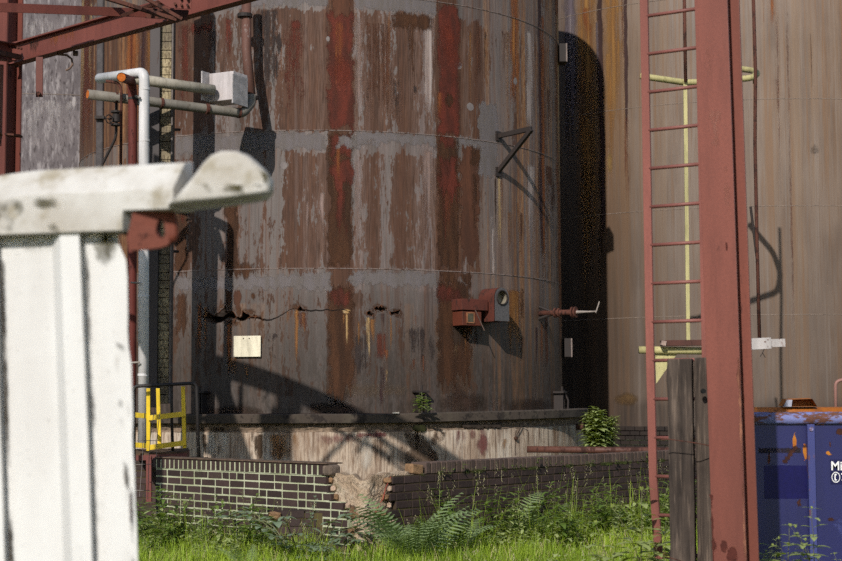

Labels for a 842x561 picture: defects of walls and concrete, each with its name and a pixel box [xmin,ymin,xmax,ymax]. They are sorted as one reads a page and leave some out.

peeling [303,0,486,404]
water stain [251,434,263,459]